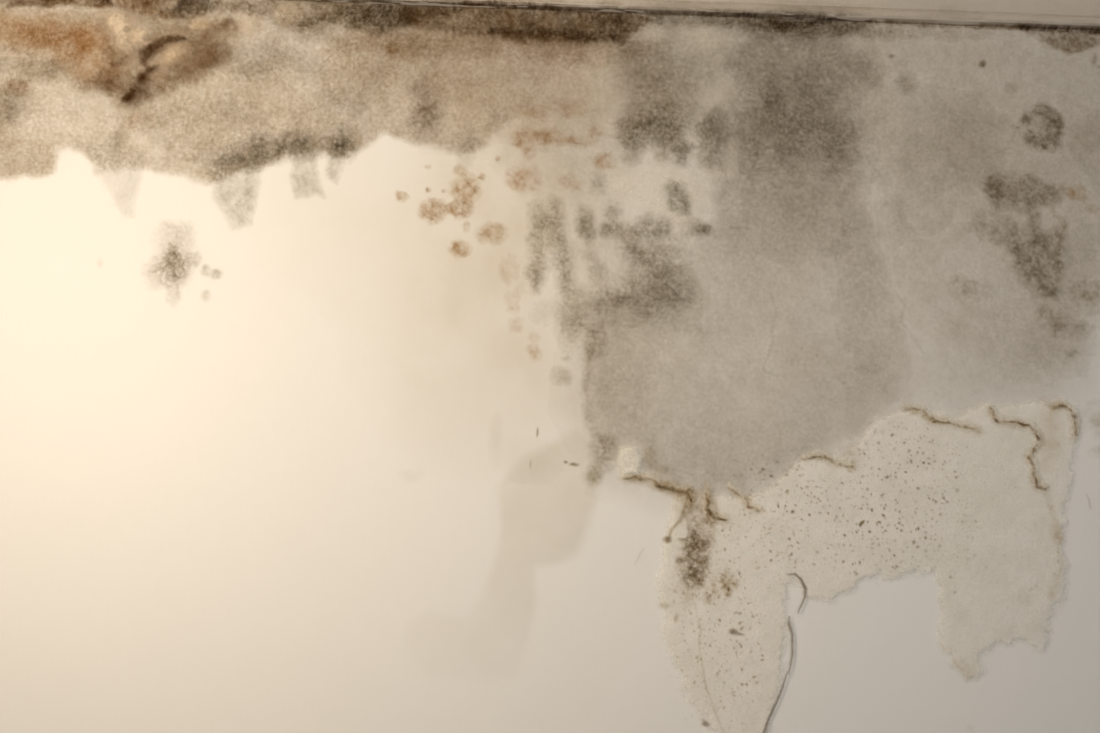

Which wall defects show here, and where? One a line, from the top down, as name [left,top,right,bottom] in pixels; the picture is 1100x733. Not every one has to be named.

peeling [657,401,1077,733]